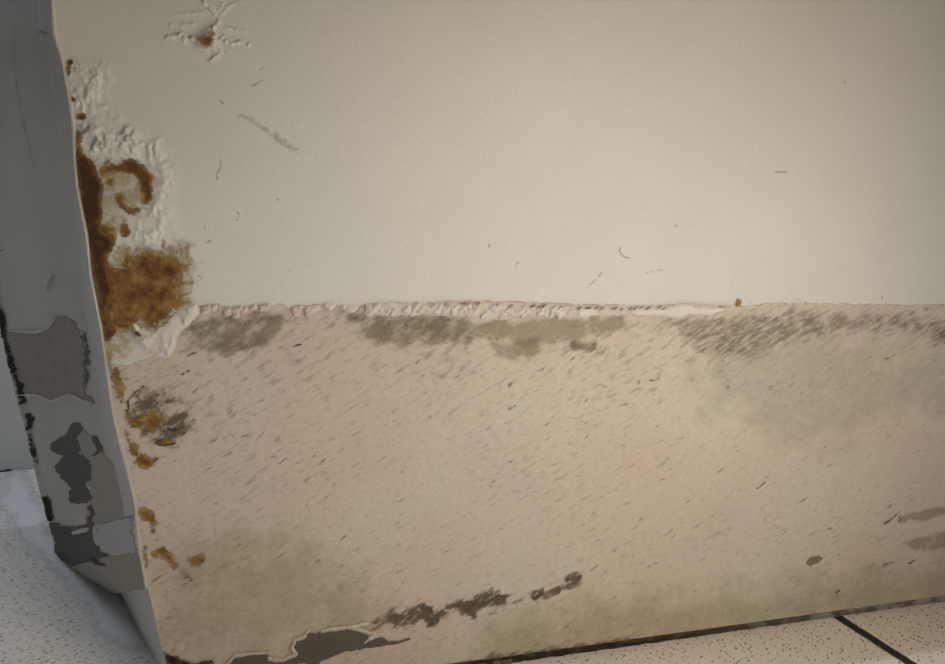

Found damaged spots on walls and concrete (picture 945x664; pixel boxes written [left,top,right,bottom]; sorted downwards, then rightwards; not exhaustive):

rust [76,112,193,403]
peeling [200,303,271,319]
peeling [290,300,735,320]
peeling [0,310,95,463]
rust [125,408,171,469]
damp [108,302,945,664]
peeling [41,423,144,594]
rust [138,507,158,533]
rust [143,546,206,581]
rust [164,652,214,664]
peeling [225,622,410,664]